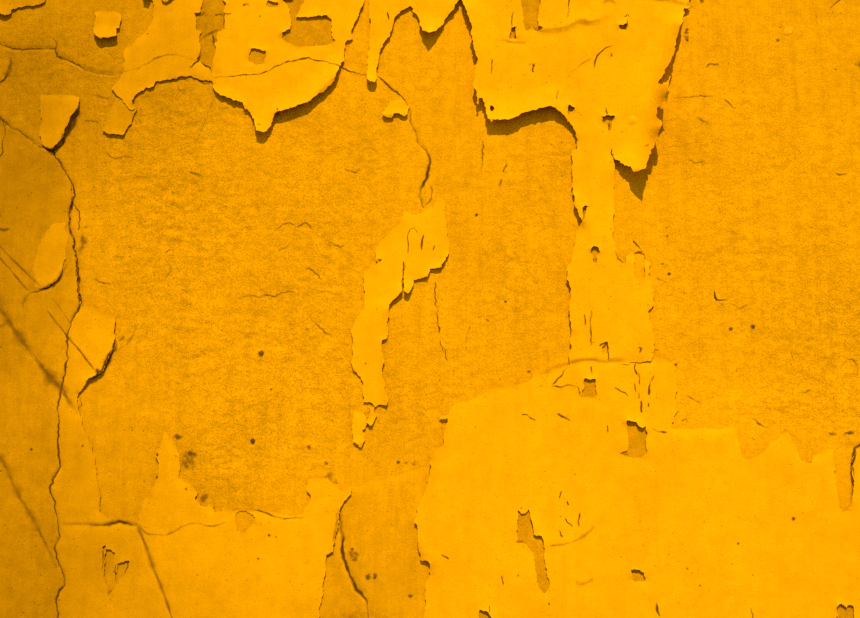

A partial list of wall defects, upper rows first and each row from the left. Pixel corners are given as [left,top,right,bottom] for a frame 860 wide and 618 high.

crack [0,43,85,83]
peeling [93,10,122,39]
peeling [102,0,364,135]
peeling [382,99,410,118]
peeling [367,0,459,82]
crack [0,113,105,617]
crack [93,338,123,378]
peeling [0,119,431,618]
peeling [351,197,449,448]
peeling [414,0,860,618]